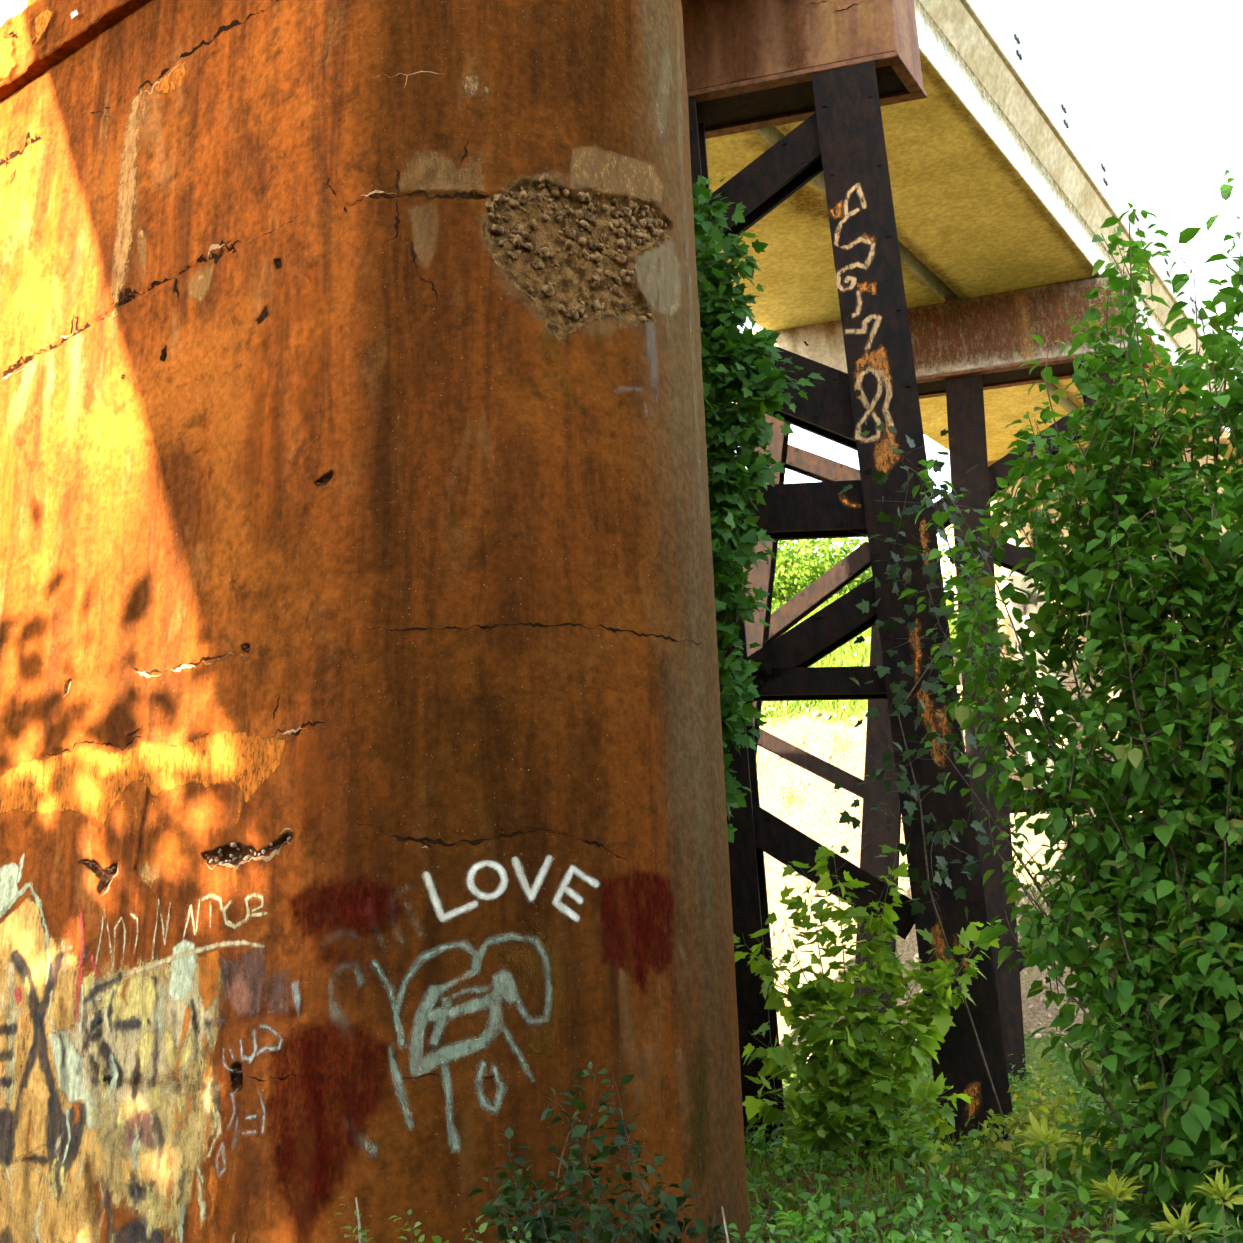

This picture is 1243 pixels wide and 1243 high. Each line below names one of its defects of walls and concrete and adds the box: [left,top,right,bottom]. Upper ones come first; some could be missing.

crack [138,0,278,94]
crack [0,132,42,183]
crack [323,140,489,301]
spalling [483,146,681,343]
crack [0,215,299,381]
crack [369,622,701,645]
crack [46,725,213,757]
crack [269,695,329,741]
peeling [0,729,285,830]
spalling [77,859,120,897]
spalling [200,828,293,878]
rust [192,1155,206,1226]